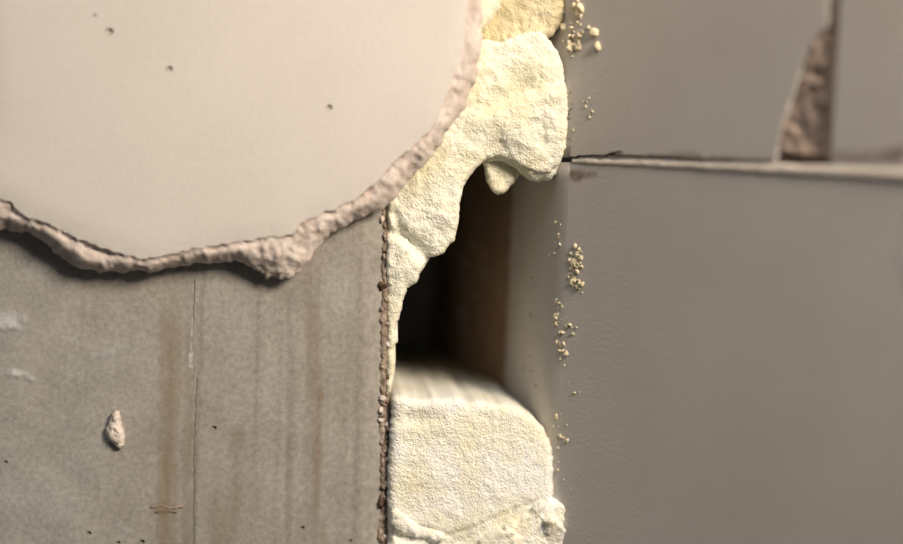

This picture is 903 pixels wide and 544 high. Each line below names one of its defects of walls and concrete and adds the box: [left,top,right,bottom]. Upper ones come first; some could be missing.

crack [569,151,770,161]
spalling [779,23,839,159]
spalling [377,206,390,544]